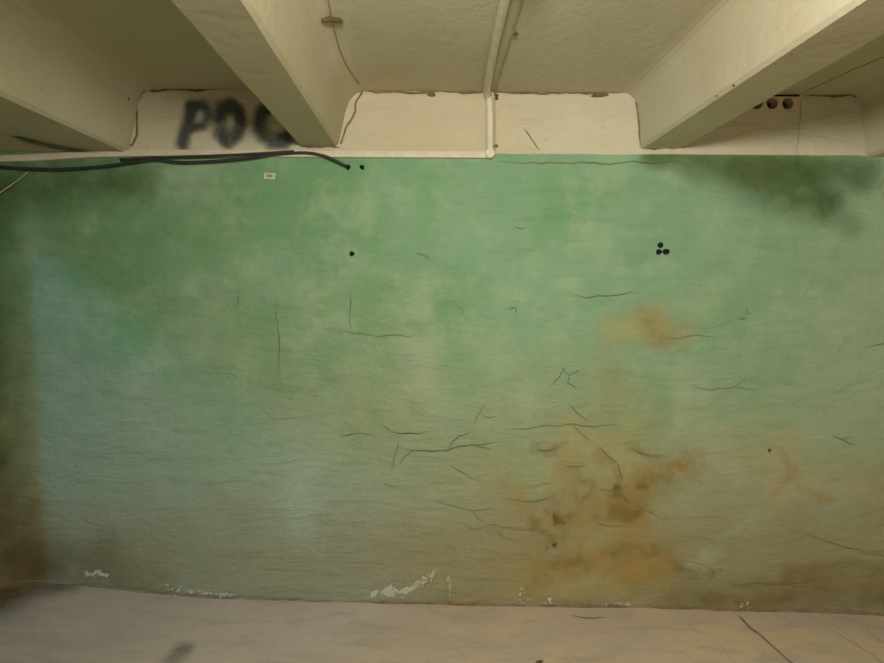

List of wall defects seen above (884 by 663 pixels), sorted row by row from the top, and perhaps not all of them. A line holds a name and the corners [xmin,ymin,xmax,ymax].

damp [724,156,824,196]
crack [340,404,495,488]
crack [511,368,662,519]